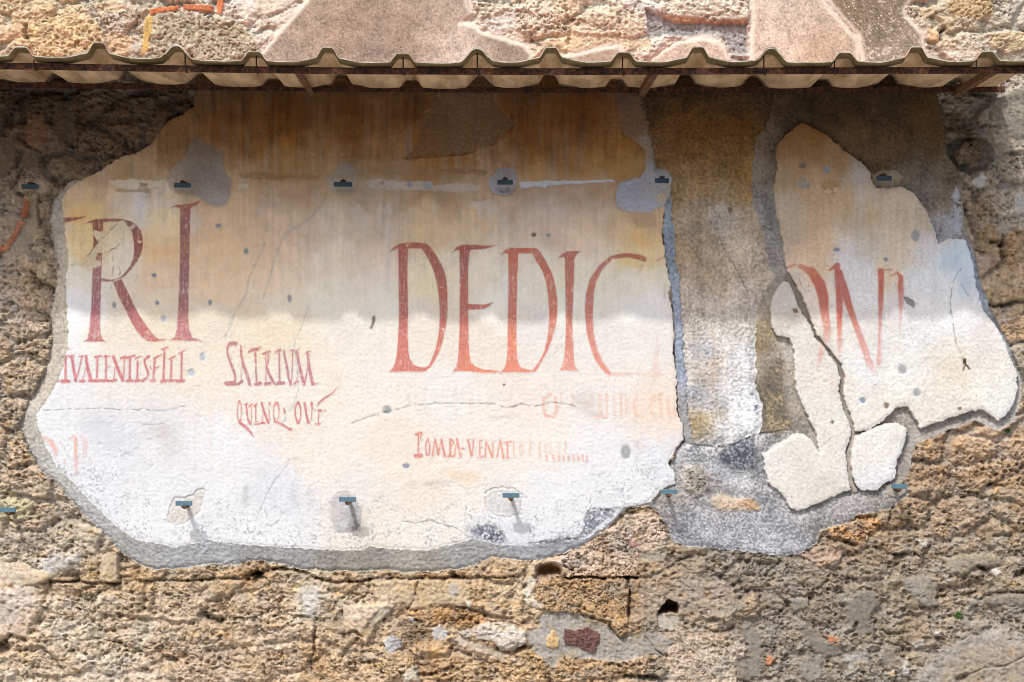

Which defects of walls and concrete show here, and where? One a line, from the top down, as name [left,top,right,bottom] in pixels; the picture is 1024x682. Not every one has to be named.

crack [351,402,576,424]
crack [783,272,858,494]